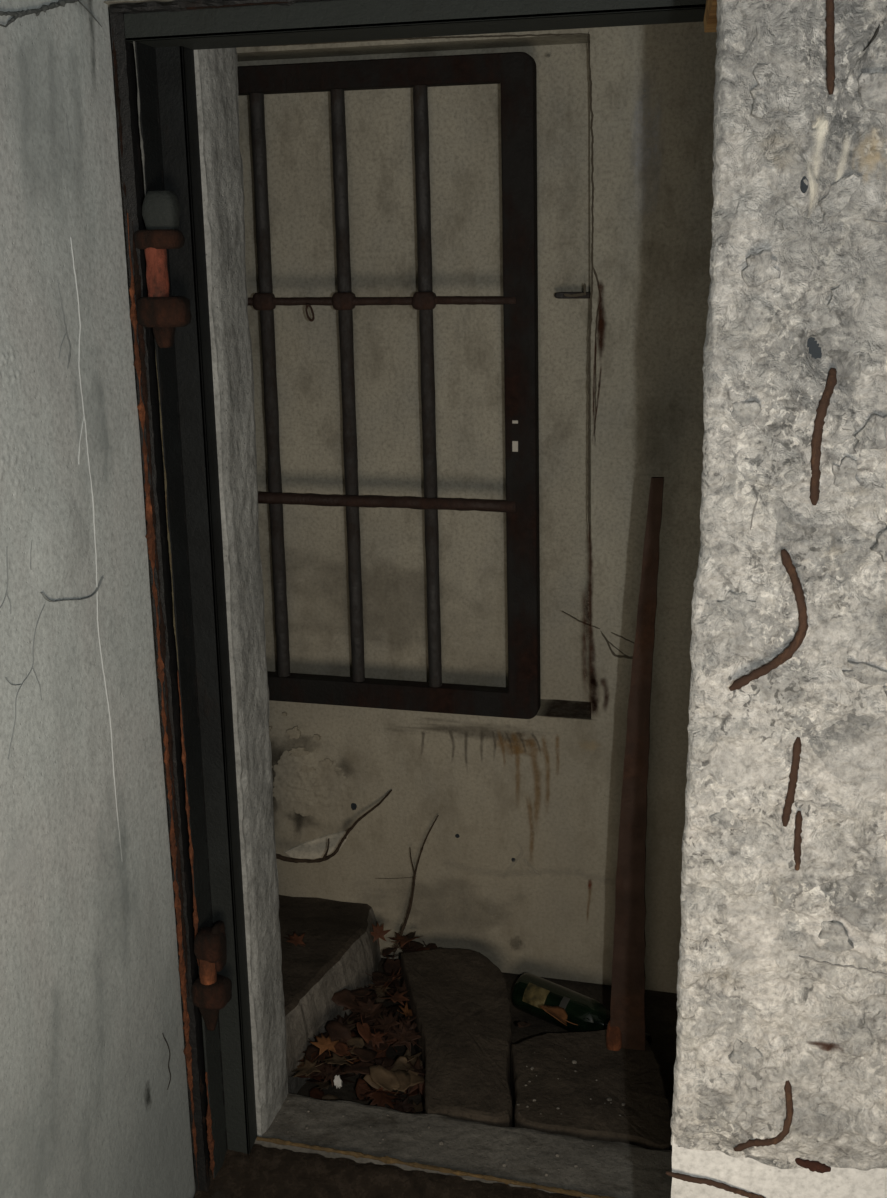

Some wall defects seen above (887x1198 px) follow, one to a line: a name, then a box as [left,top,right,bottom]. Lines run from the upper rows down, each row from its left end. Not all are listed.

spalling [671,0,887,1173]
spalling [666,1171,766,1198]